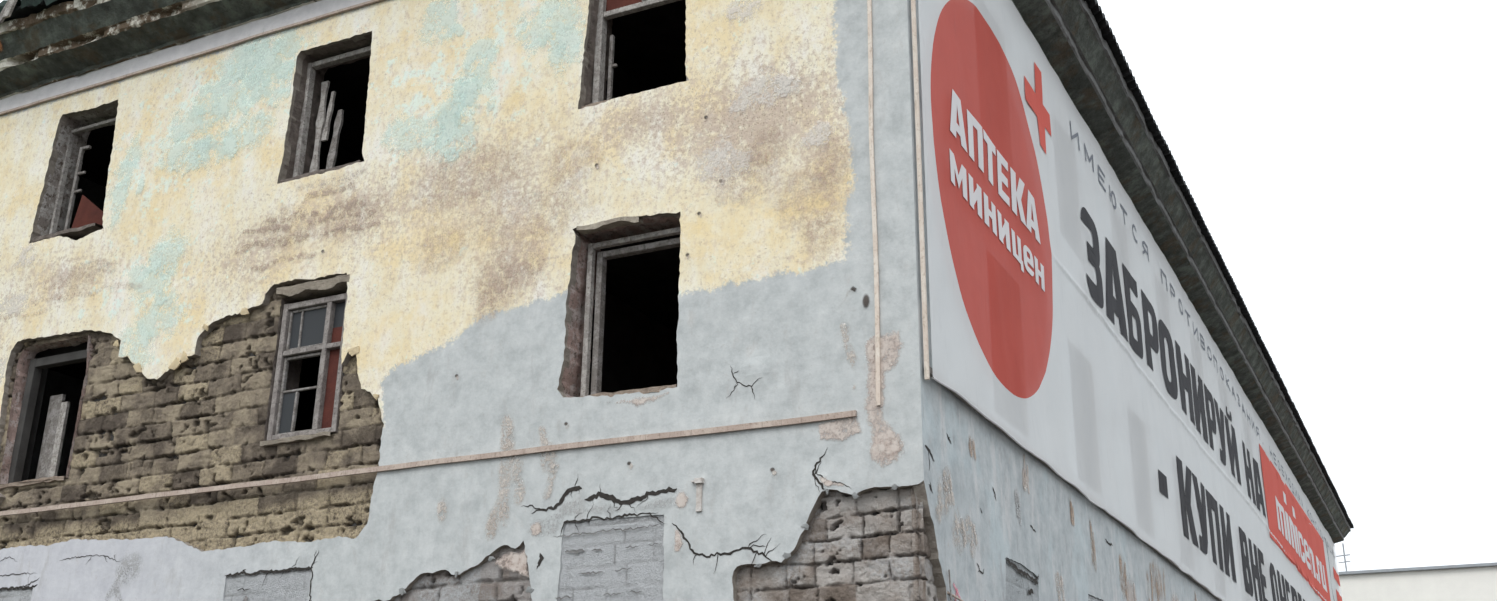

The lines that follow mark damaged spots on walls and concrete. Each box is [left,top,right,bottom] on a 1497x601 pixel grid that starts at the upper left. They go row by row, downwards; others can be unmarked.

spalling [0,281,384,551]
crack [728,366,763,399]
crack [812,447,849,492]
peeling [819,324,903,465]
spalling [381,501,602,601]
crack [521,478,776,600]
spalling [736,477,964,601]